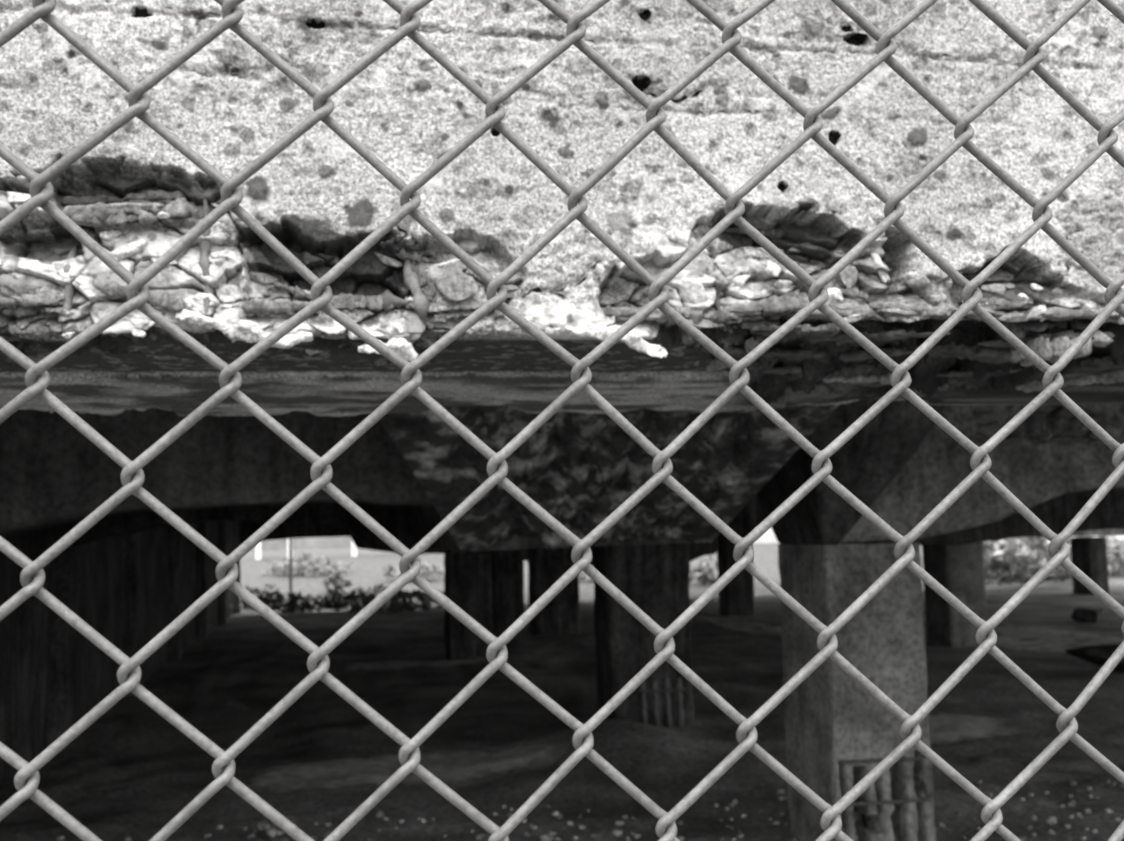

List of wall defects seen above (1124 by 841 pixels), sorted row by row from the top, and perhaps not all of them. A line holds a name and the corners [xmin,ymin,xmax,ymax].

spalling [0,163,526,369]
spalling [598,207,1124,453]